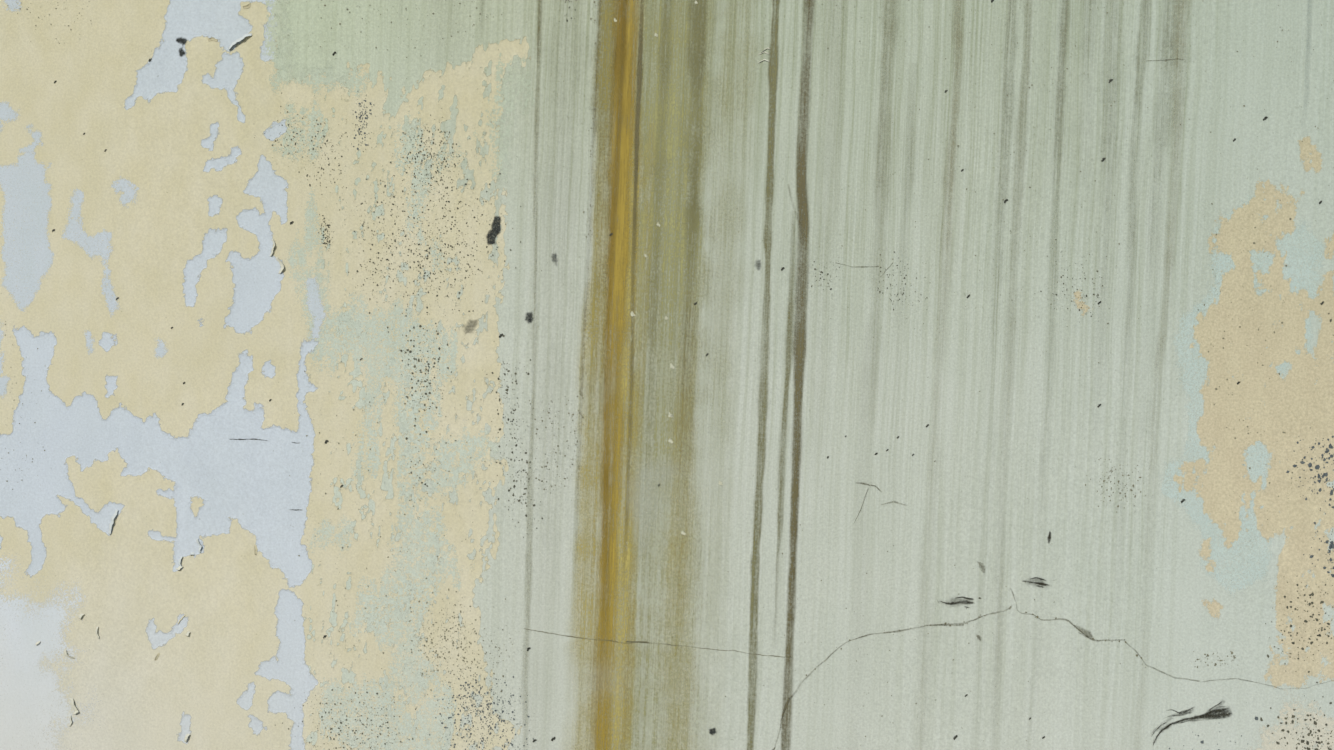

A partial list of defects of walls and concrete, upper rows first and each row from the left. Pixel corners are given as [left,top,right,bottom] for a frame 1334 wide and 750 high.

peeling [0,0,531,750]
rust [576,0,643,750]
damp [633,0,712,513]
damp [747,0,840,750]
spalling [1153,702,1231,745]
peeling [1173,179,1334,750]
peeling [1297,136,1323,174]